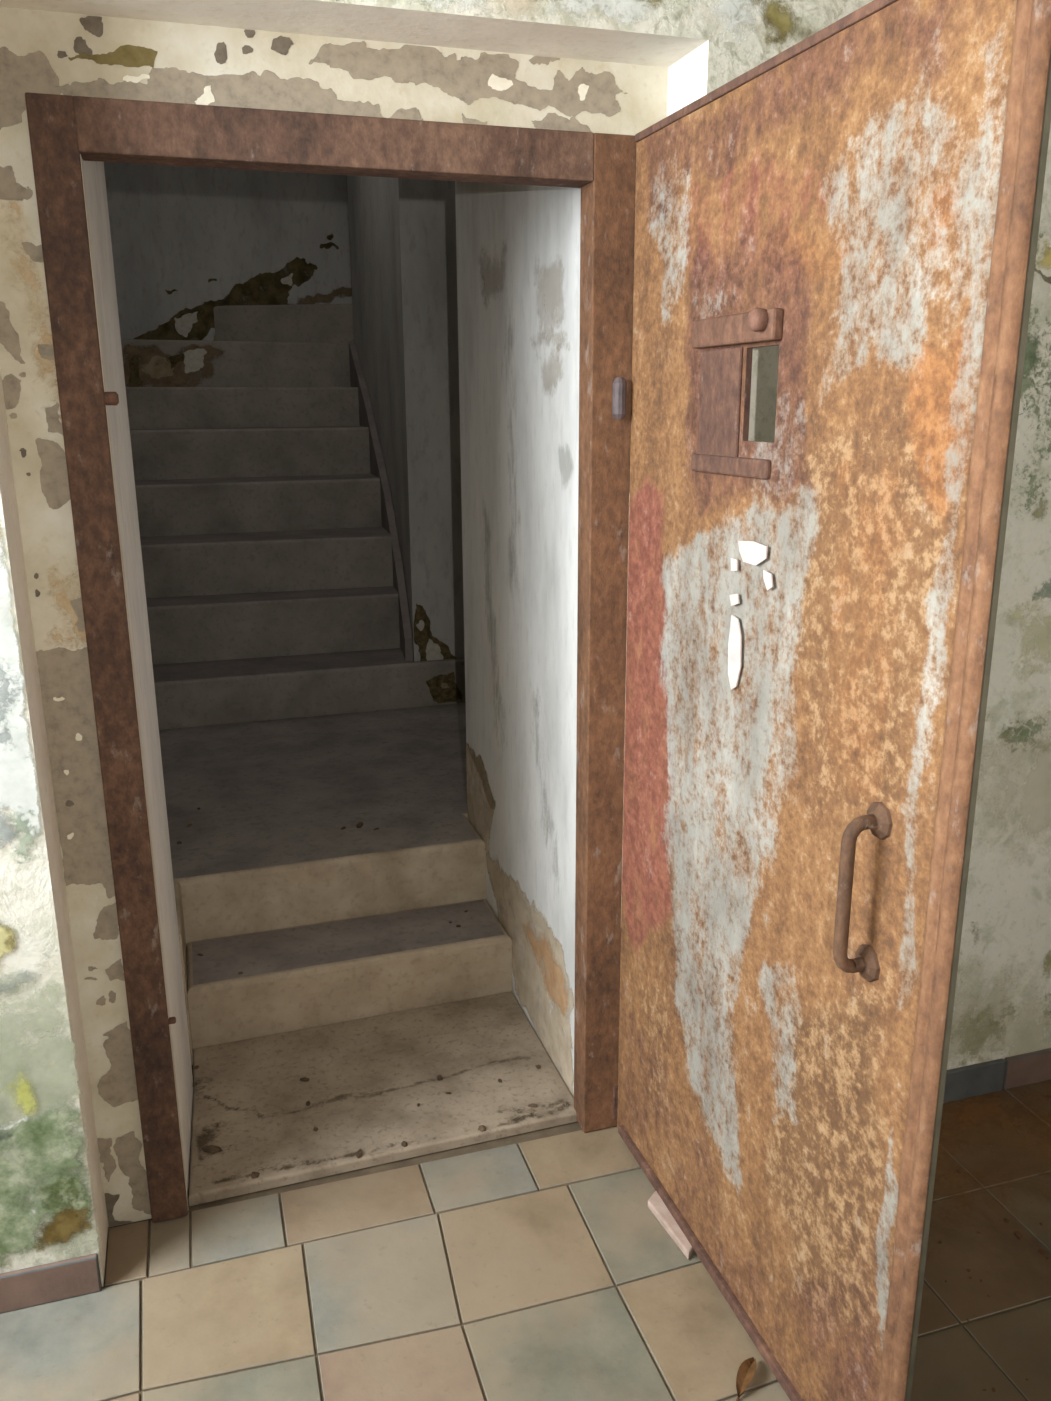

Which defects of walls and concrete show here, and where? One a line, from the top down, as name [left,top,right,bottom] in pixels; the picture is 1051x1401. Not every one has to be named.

peeling [0,16,628,133]
leakage [547,0,656,24]
leakage [713,0,810,44]
flaking render [123,257,352,387]
crack [1035,267,1051,284]
peeling [19,402,70,509]
leakage [1022,325,1051,518]
leakage [0,669,21,743]
flaking render [0,543,119,940]
flaking render [97,1021,138,1107]
leakage [0,970,98,1267]
flaking render [97,1131,151,1227]